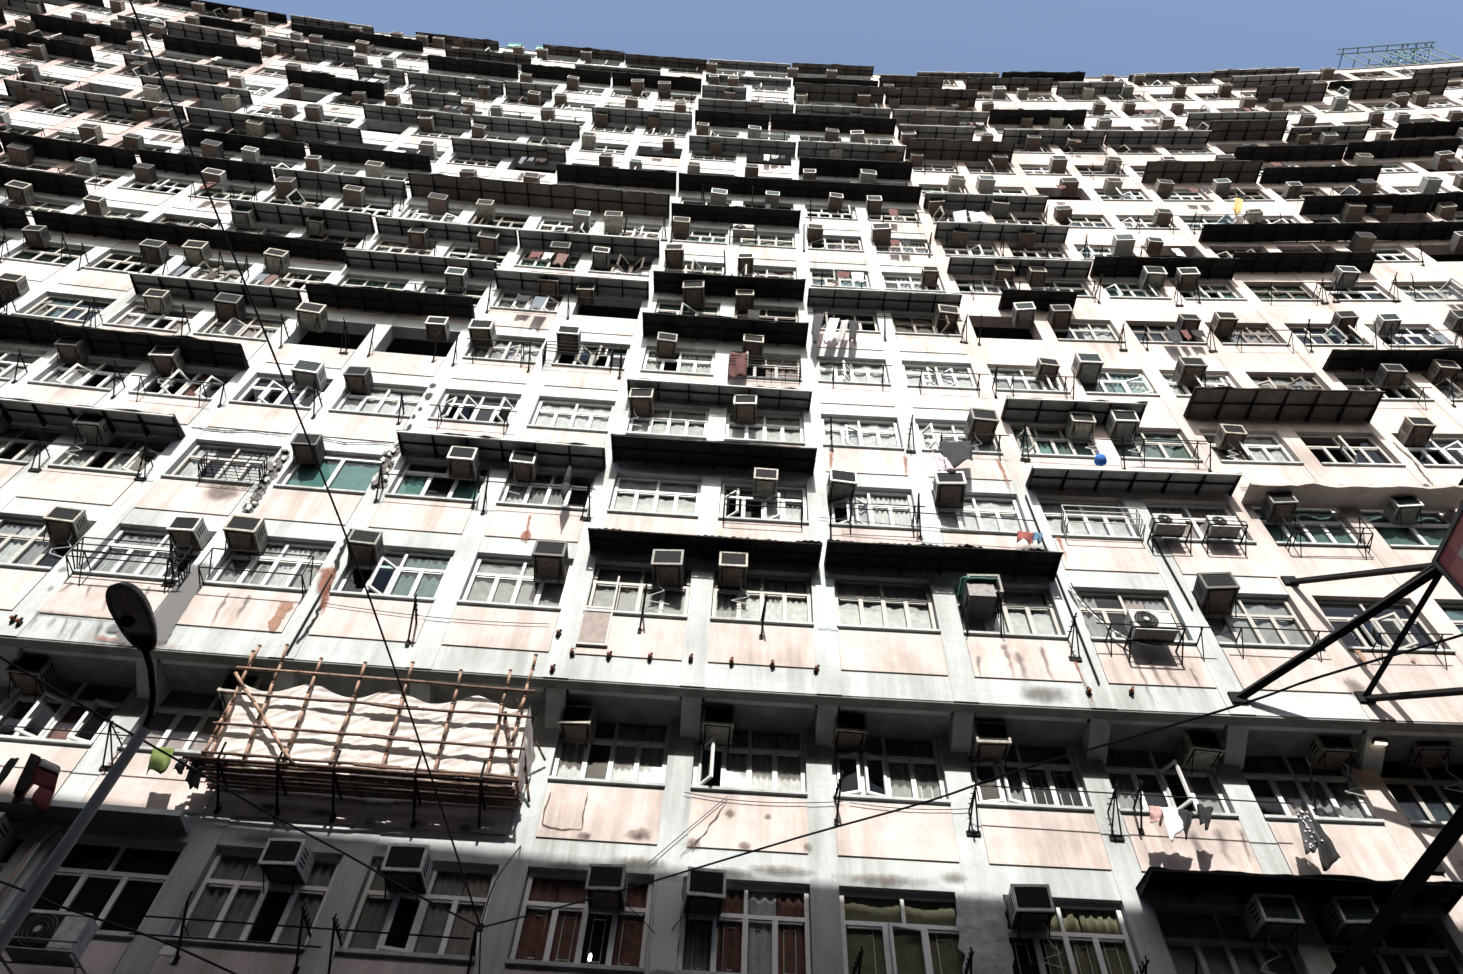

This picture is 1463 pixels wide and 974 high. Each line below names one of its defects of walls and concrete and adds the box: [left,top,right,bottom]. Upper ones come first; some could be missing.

corrosion [317,568,335,606]